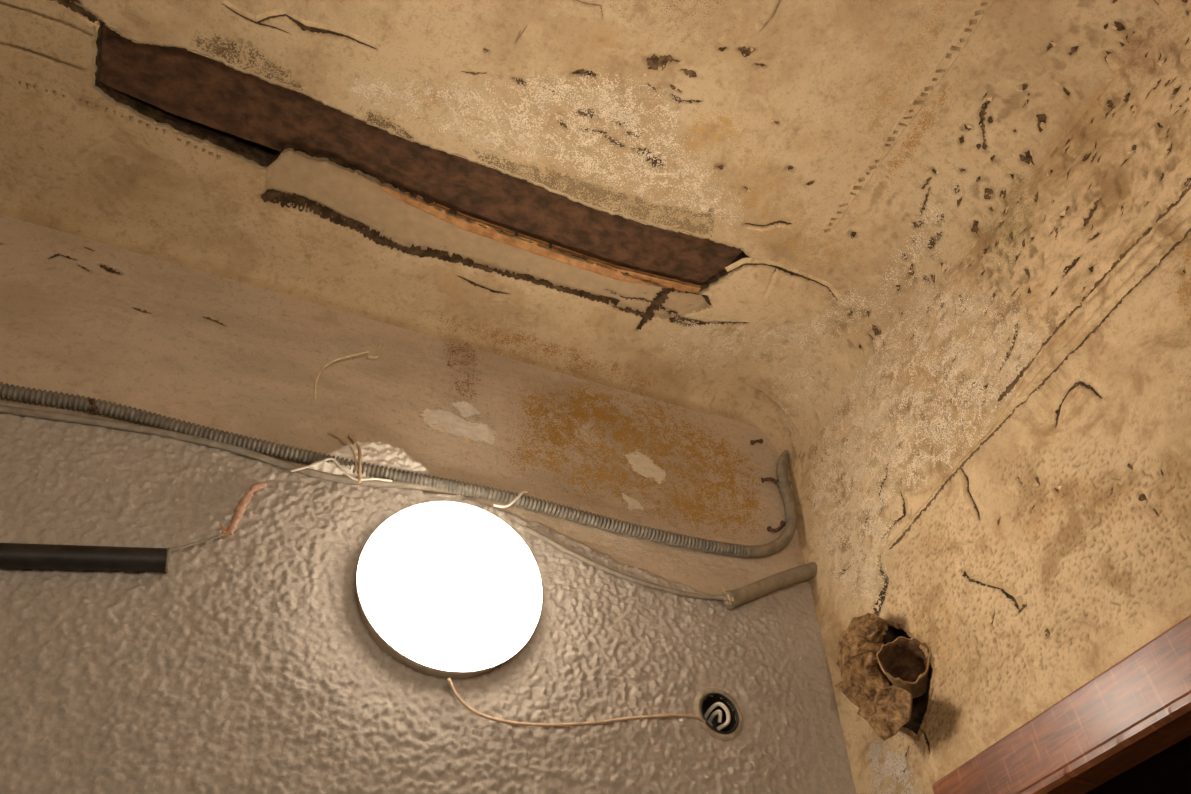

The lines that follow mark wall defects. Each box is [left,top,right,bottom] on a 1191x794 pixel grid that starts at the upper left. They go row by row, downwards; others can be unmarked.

crack [222,0,378,49]
peeling [1104,21,1135,63]
peeling [1091,78,1191,123]
peeling [1157,123,1172,181]
peeling [49,254,120,274]
crack [261,189,748,330]
crack [725,221,841,301]
flaking render [89,17,1101,741]
crack [836,184,1191,616]
damp [501,377,774,542]
peeling [865,738,926,794]